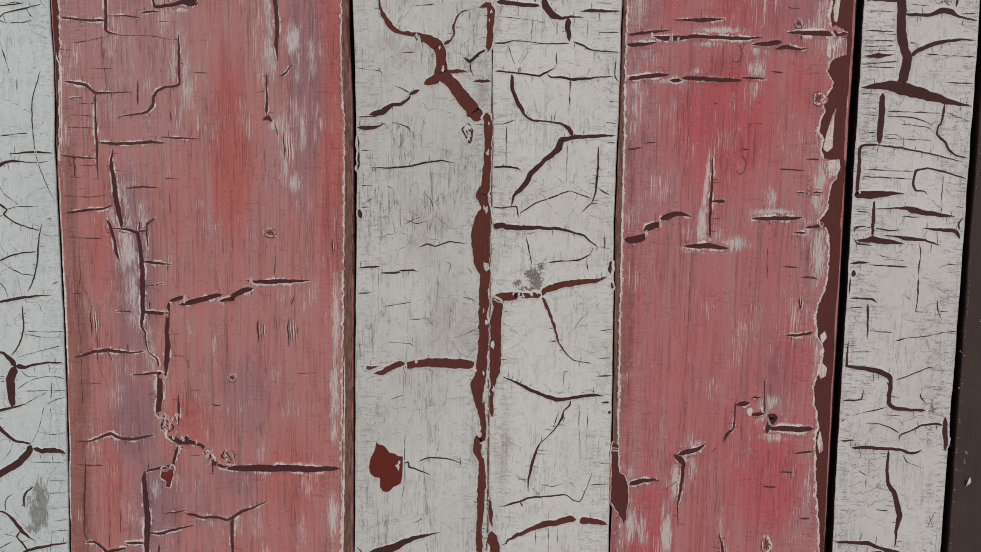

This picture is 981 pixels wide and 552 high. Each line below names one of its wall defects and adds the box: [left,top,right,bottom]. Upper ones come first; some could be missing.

crack [0,0,340,552]
peeling [367,441,404,494]
crack [356,0,978,552]
peeling [810,0,857,552]